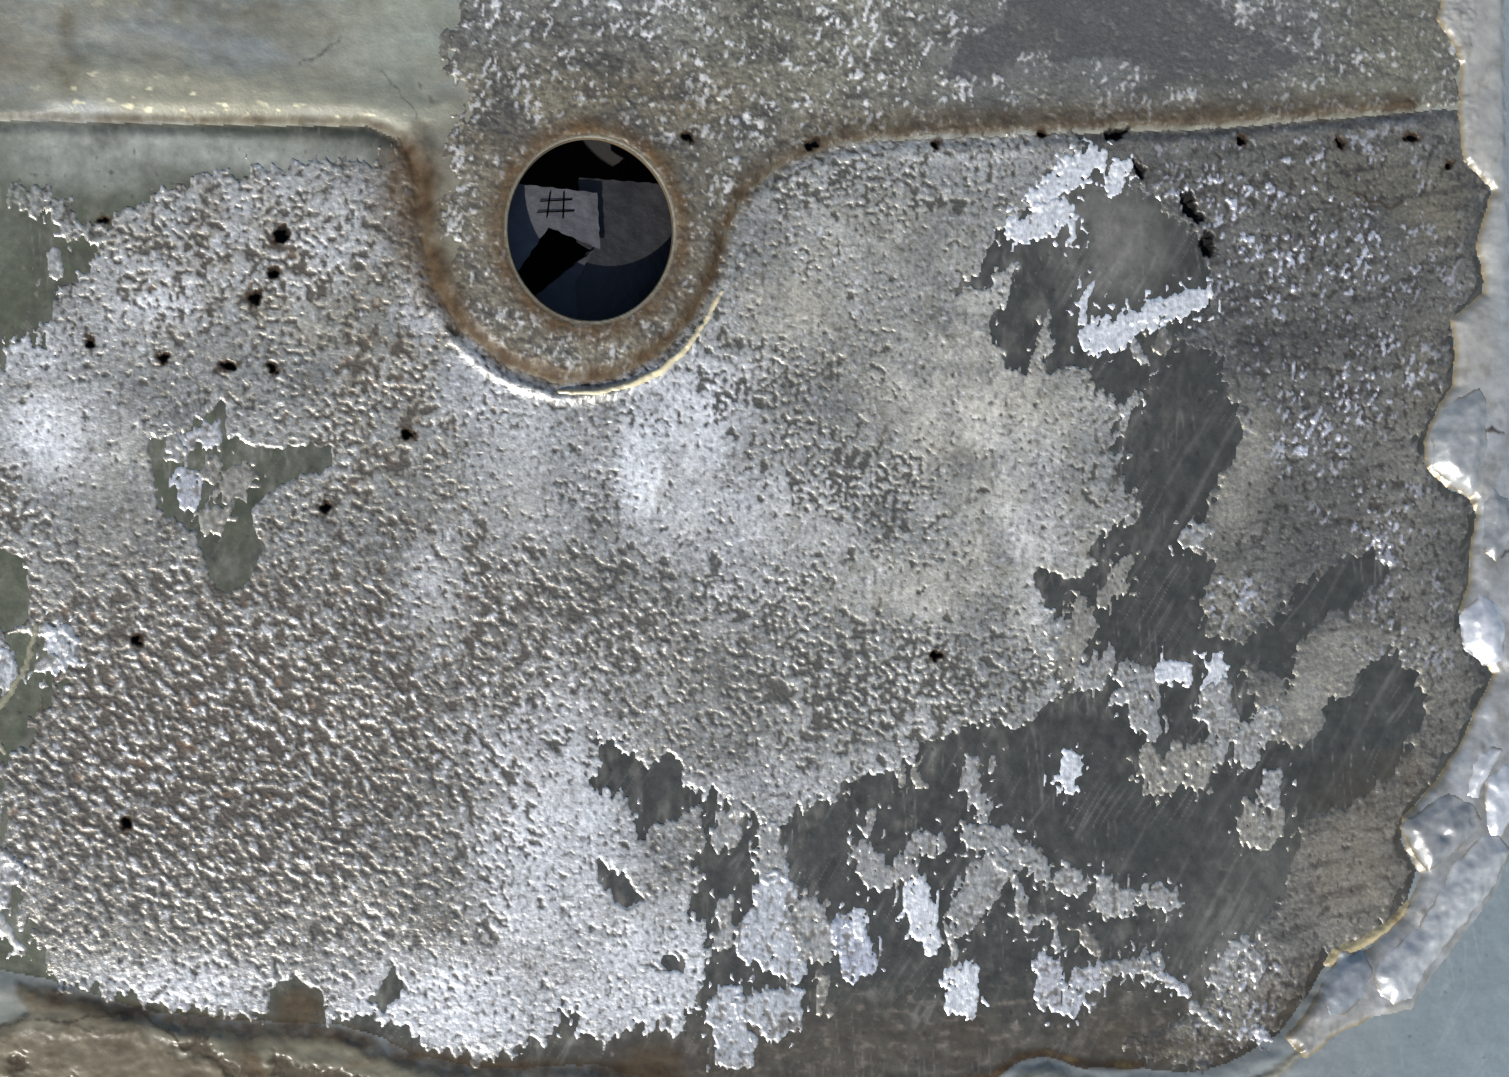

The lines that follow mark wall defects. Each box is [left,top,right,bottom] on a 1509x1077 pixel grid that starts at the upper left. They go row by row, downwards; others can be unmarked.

peeling [993,137,1140,257]
peeling [36,232,72,295]
peeling [1066,270,1221,376]
corrosion [436,0,1490,1077]
peeling [1168,514,1215,560]
peeling [0,609,88,696]
corrosion [0,129,1146,1069]
peeling [1034,543,1297,856]
peeling [0,847,41,959]
peeling [698,743,1283,1073]
corrosion [240,1051,268,1077]